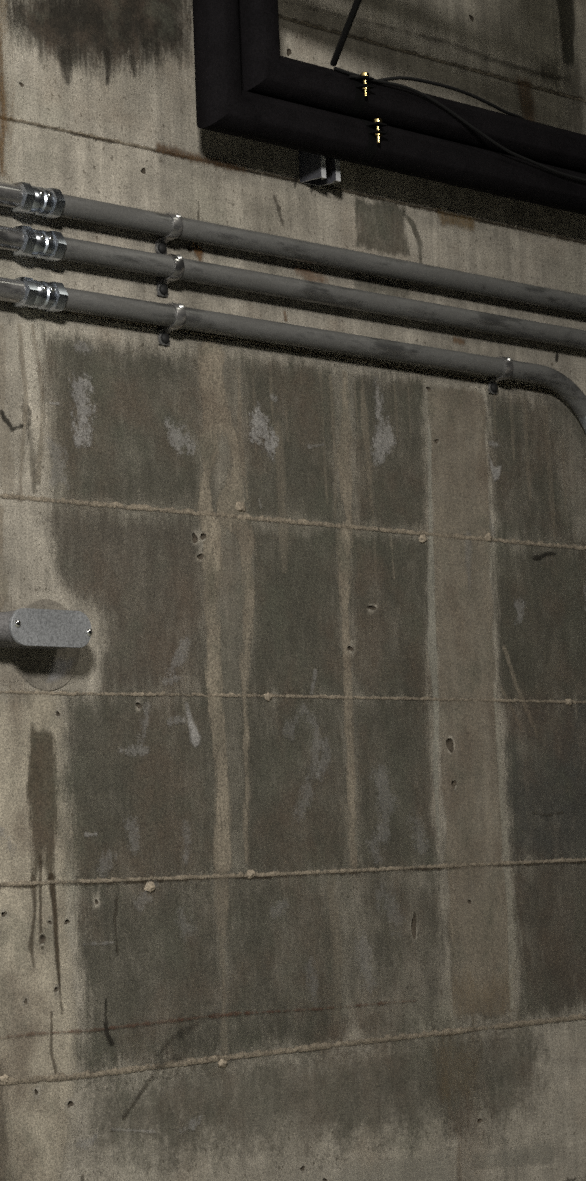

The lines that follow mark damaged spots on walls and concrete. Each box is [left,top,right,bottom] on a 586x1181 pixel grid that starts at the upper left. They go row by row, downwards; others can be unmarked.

water stain [0,336,586,1181]